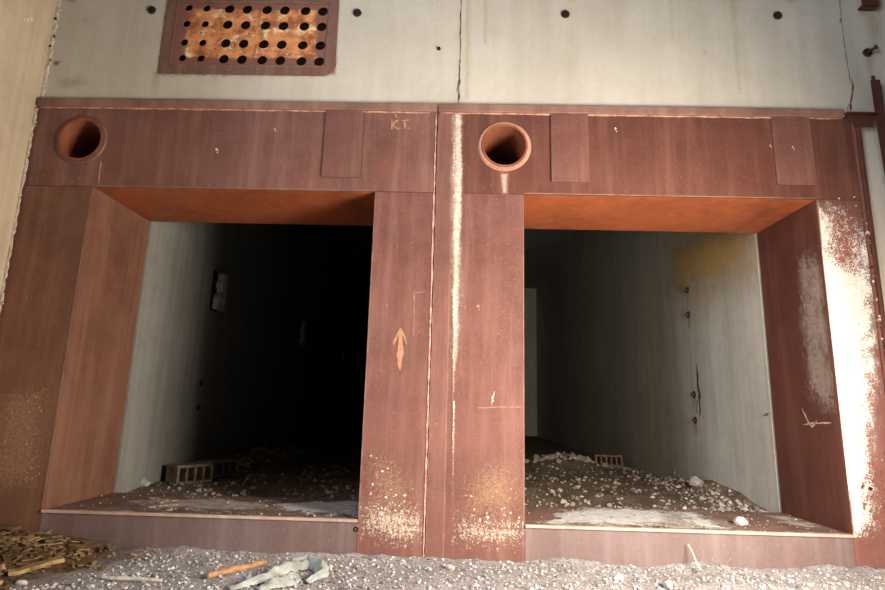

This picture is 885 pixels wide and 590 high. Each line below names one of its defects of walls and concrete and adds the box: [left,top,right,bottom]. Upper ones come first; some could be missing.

leakage [453,114,462,371]